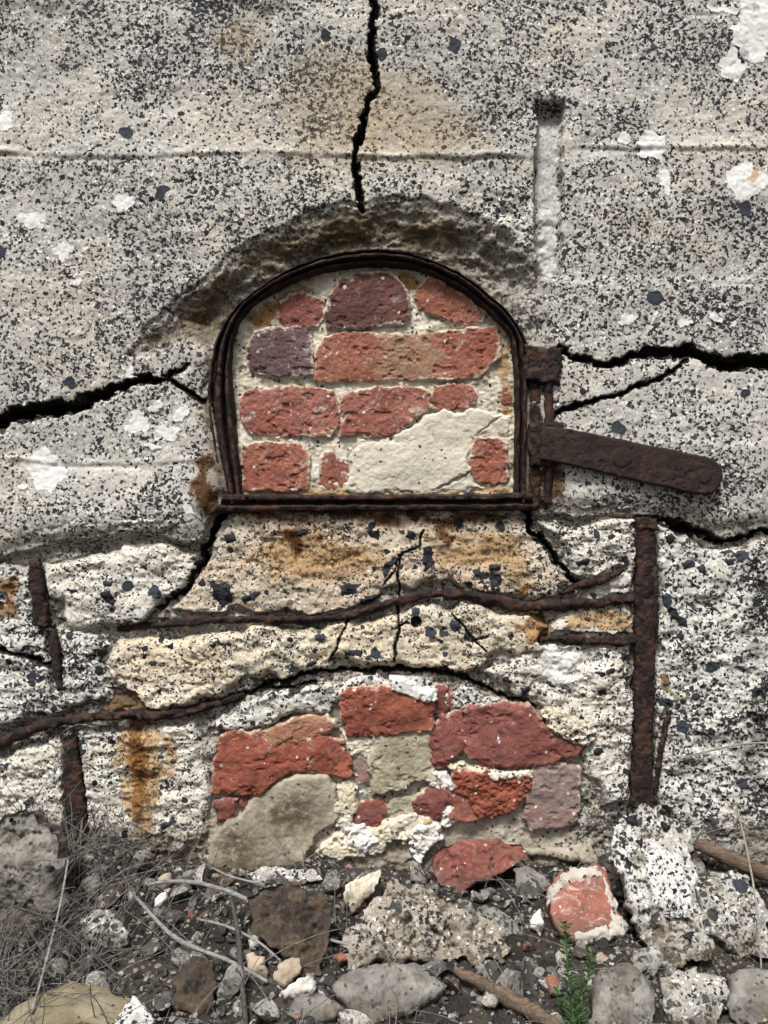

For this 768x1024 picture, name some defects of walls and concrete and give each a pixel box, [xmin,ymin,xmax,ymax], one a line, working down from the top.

crack [351,0,381,214]
crack [0,363,207,431]
crack [554,343,768,418]
corrosion [192,456,218,515]
crack [154,513,229,611]
crack [522,511,580,583]
crack [654,515,768,545]
spalling [0,511,636,1024]
peeling [645,963,679,981]
peeling [738,923,768,968]
peeling [688,1013,706,1024]